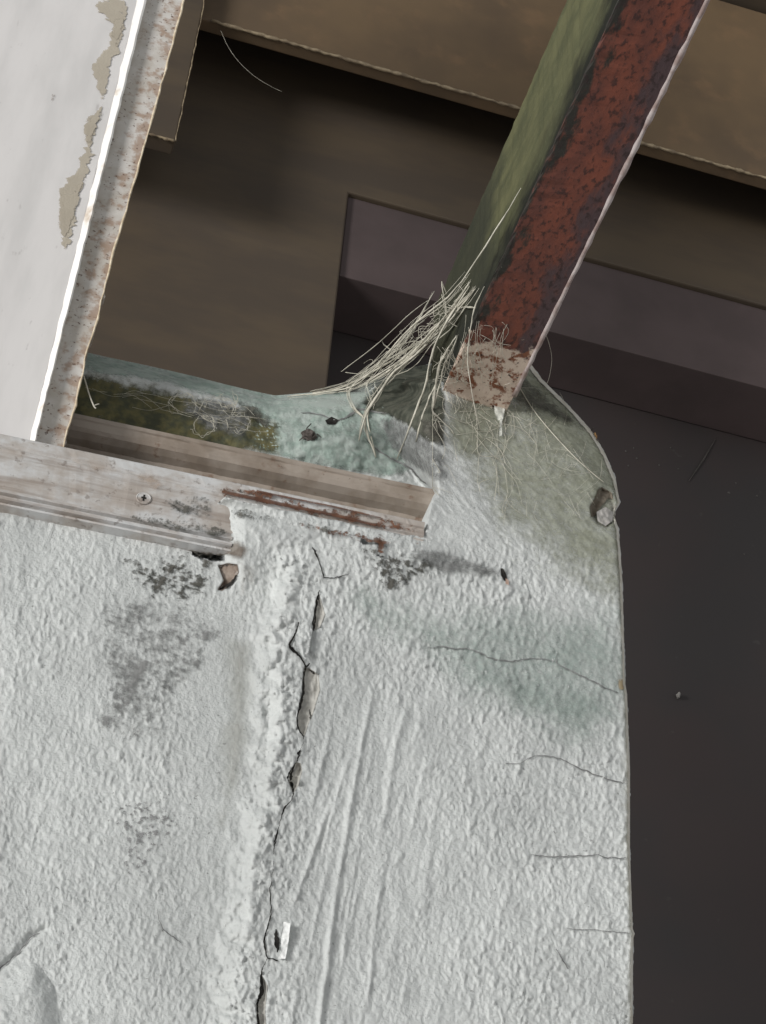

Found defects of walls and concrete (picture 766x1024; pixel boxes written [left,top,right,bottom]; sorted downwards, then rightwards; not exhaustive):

peeling [59,0,127,249]
rust [222,488,410,553]
water stain [363,549,493,589]
water stain [102,543,245,729]
crack [427,646,618,693]
crack [256,547,348,1024]
crack [506,755,625,784]
crack [531,852,626,860]